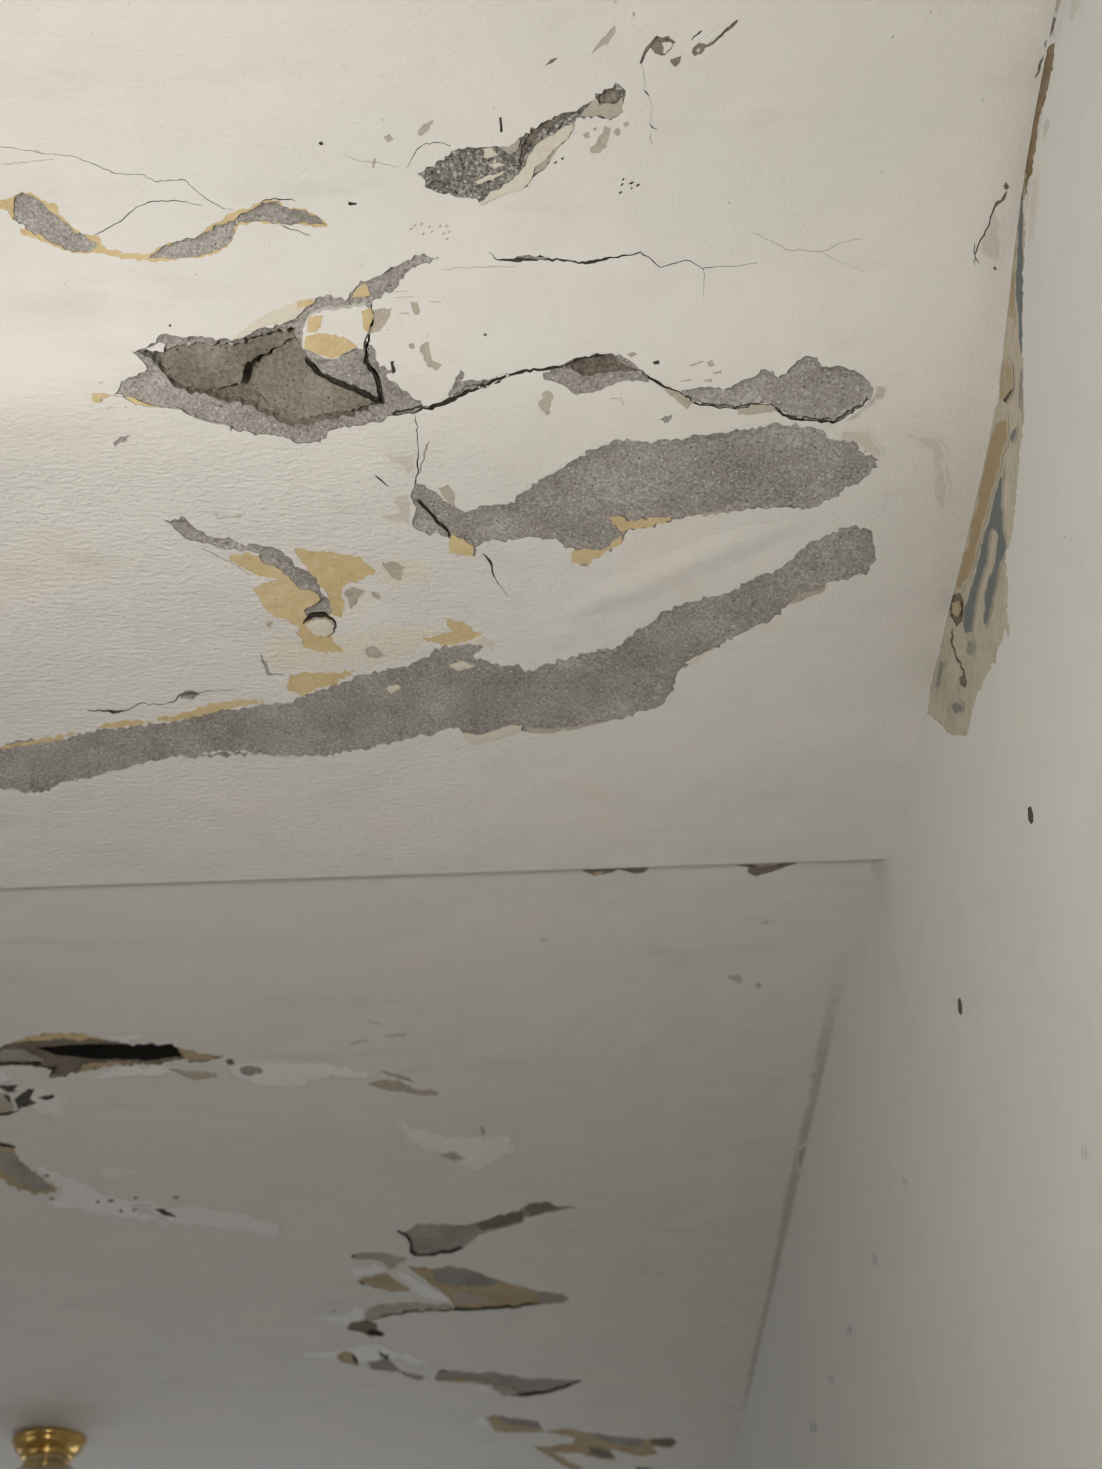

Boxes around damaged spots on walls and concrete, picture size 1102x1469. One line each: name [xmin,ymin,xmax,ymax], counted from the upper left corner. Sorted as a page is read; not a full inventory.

flaking render [418,83,629,206]
peeling [0,192,328,263]
flaking render [92,253,442,444]
flaking render [377,352,891,566]
flaking render [0,516,876,793]
flaking render [583,868,649,876]
flaking render [739,863,795,876]
flaking render [0,1032,263,1116]
peeling [368,1071,439,1096]
flaking render [0,1142,57,1200]
flaking render [292,1201,583,1397]
flaking render [471,1414,677,1469]